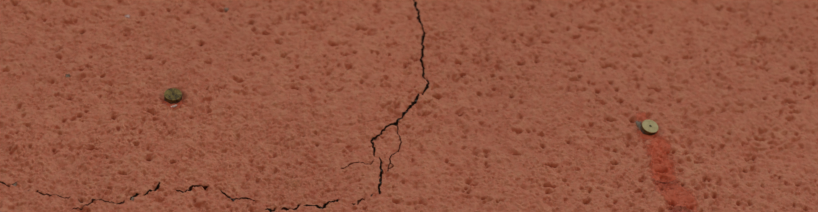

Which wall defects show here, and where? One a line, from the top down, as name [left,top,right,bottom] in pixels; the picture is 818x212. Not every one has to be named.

crack [0,0,429,212]
corrosion [636,112,697,212]